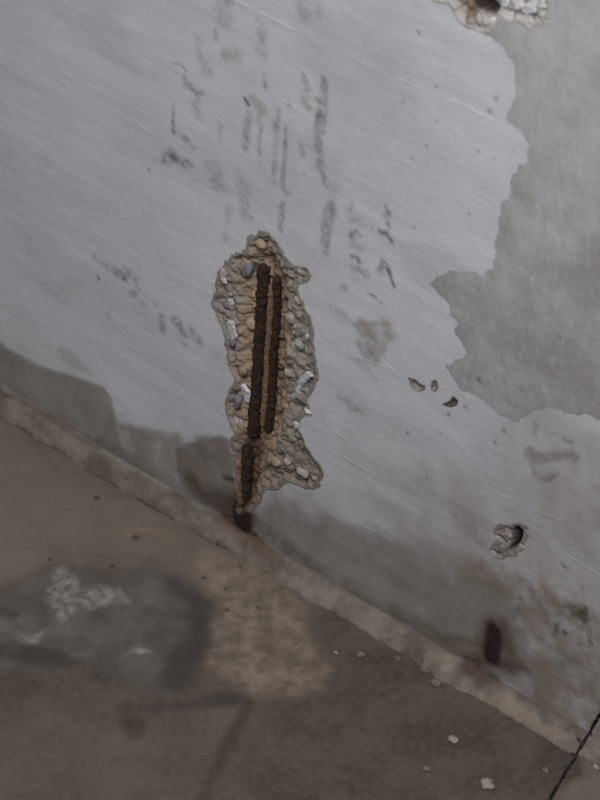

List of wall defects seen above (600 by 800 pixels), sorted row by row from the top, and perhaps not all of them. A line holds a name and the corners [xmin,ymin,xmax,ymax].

flaking render [430,0,600,422]
spalling [210,230,324,513]
spalling [488,521,530,560]